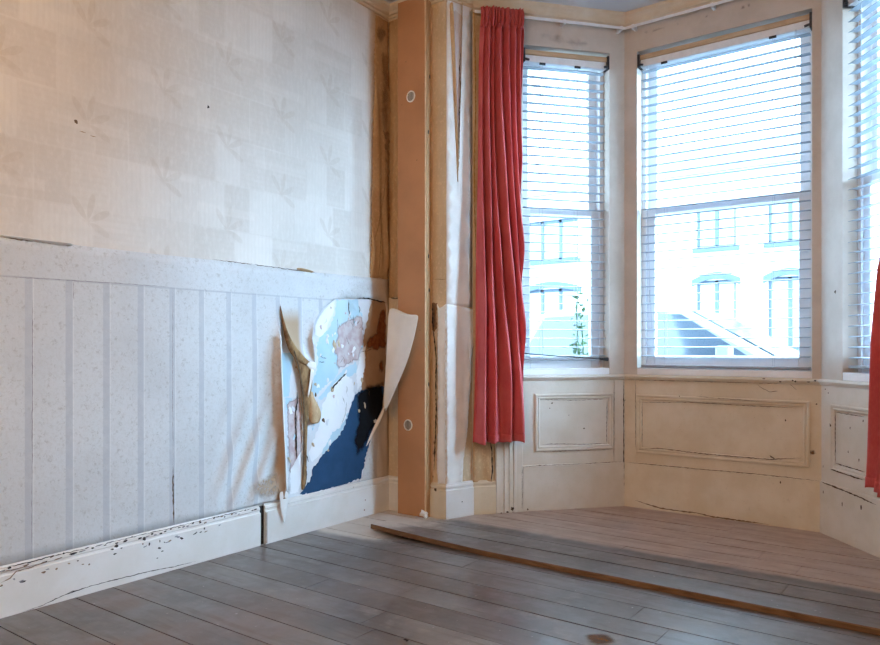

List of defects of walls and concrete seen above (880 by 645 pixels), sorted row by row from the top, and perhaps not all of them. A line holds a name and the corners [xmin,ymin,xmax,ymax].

flaking render [449,10,462,160]
flaking render [280,299,387,498]
crack [522,380,873,504]
crack [1,561,49,583]
crack [27,563,188,611]
crack [635,500,770,525]